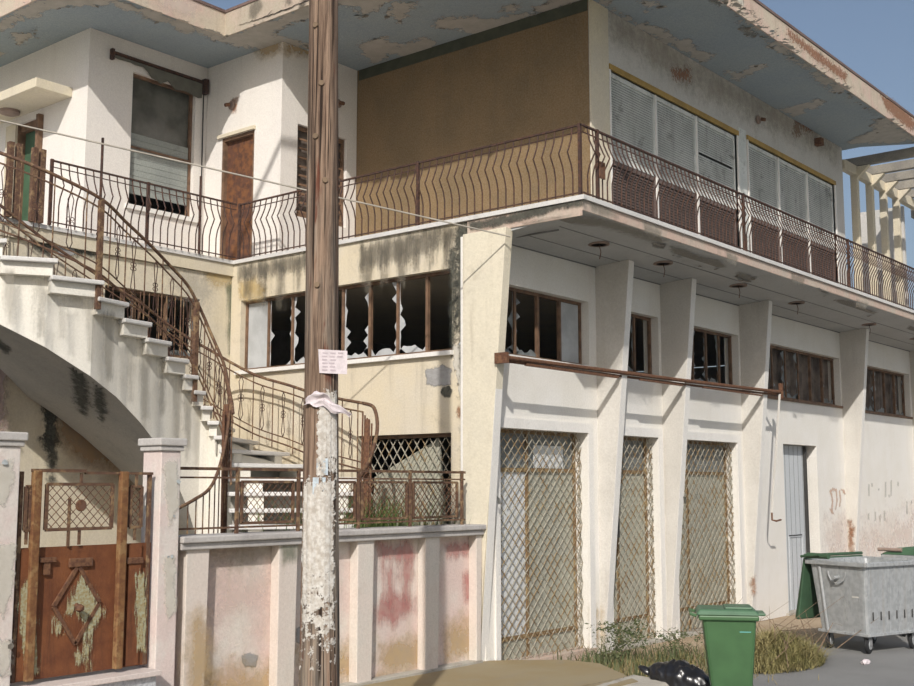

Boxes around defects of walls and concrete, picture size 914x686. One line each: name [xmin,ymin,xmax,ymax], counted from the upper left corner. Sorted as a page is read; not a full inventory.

peeling [0,0,309,50]
peeling [359,0,580,63]
peeling [718,0,914,144]
water stain [70,367,107,421]
water stain [39,407,119,483]
water stain [384,641,418,666]
water stain [450,628,469,654]